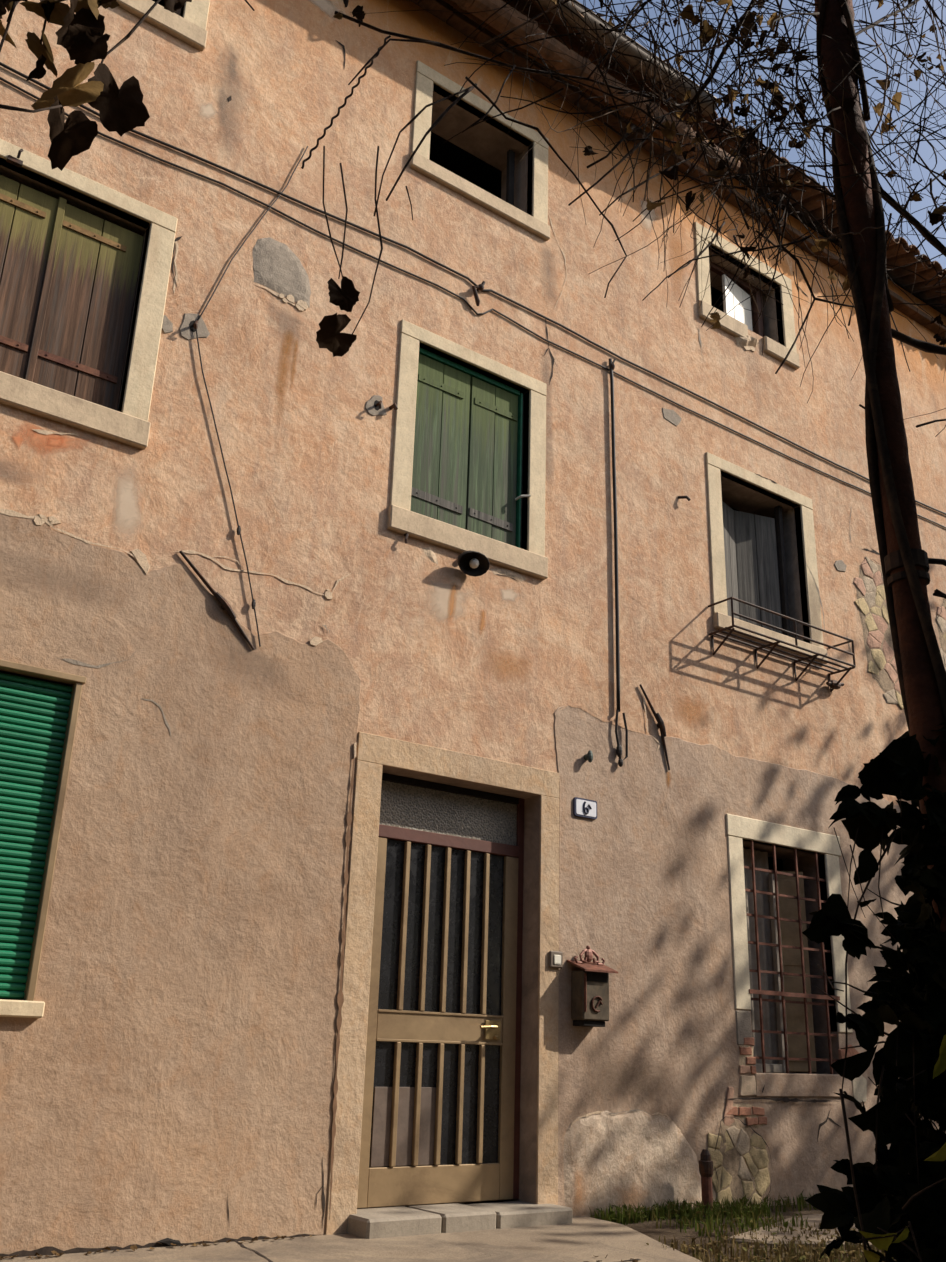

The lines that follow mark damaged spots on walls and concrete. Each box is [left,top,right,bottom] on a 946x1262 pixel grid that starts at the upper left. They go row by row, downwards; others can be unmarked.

peeling [278,293,308,312]
peeling [12,424,79,451]
peeling [0,509,150,574]
peeling [174,550,351,600]
spalling [854,556,904,709]
spalling [936,598,946,671]
spalling [738,1037,756,1074]